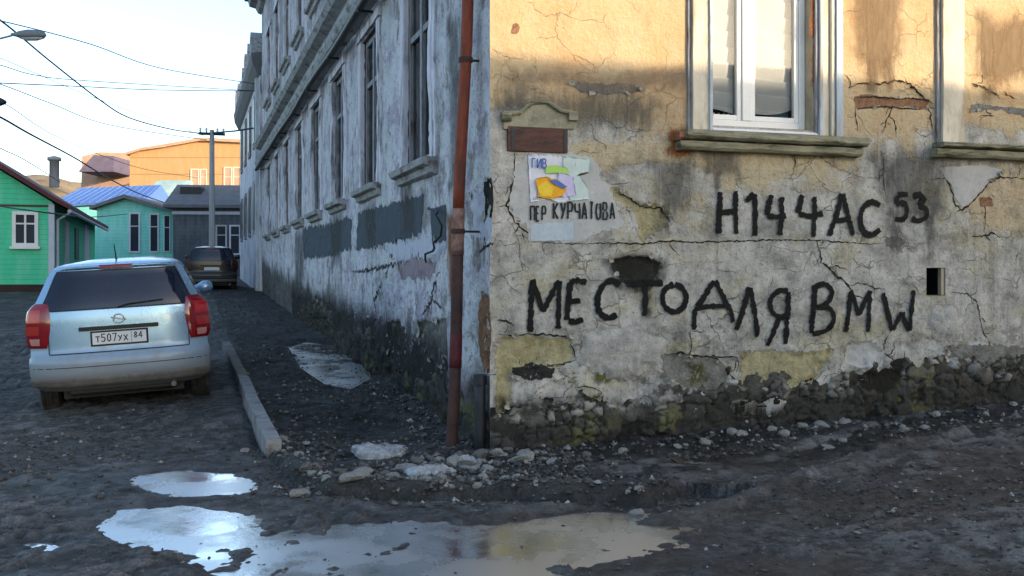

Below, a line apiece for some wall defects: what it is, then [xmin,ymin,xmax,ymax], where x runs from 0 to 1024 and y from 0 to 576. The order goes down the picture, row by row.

water stain [856,0,900,90]
water stain [977,14,1024,96]
spalling [854,94,930,110]
water stain [295,235,304,278]
crack [479,153,903,298]
peeling [938,165,1006,207]
crack [929,166,1024,240]
water stain [291,292,448,405]
spalling [478,291,576,417]
crack [486,292,576,361]
crack [672,330,739,380]
spalling [661,341,885,425]